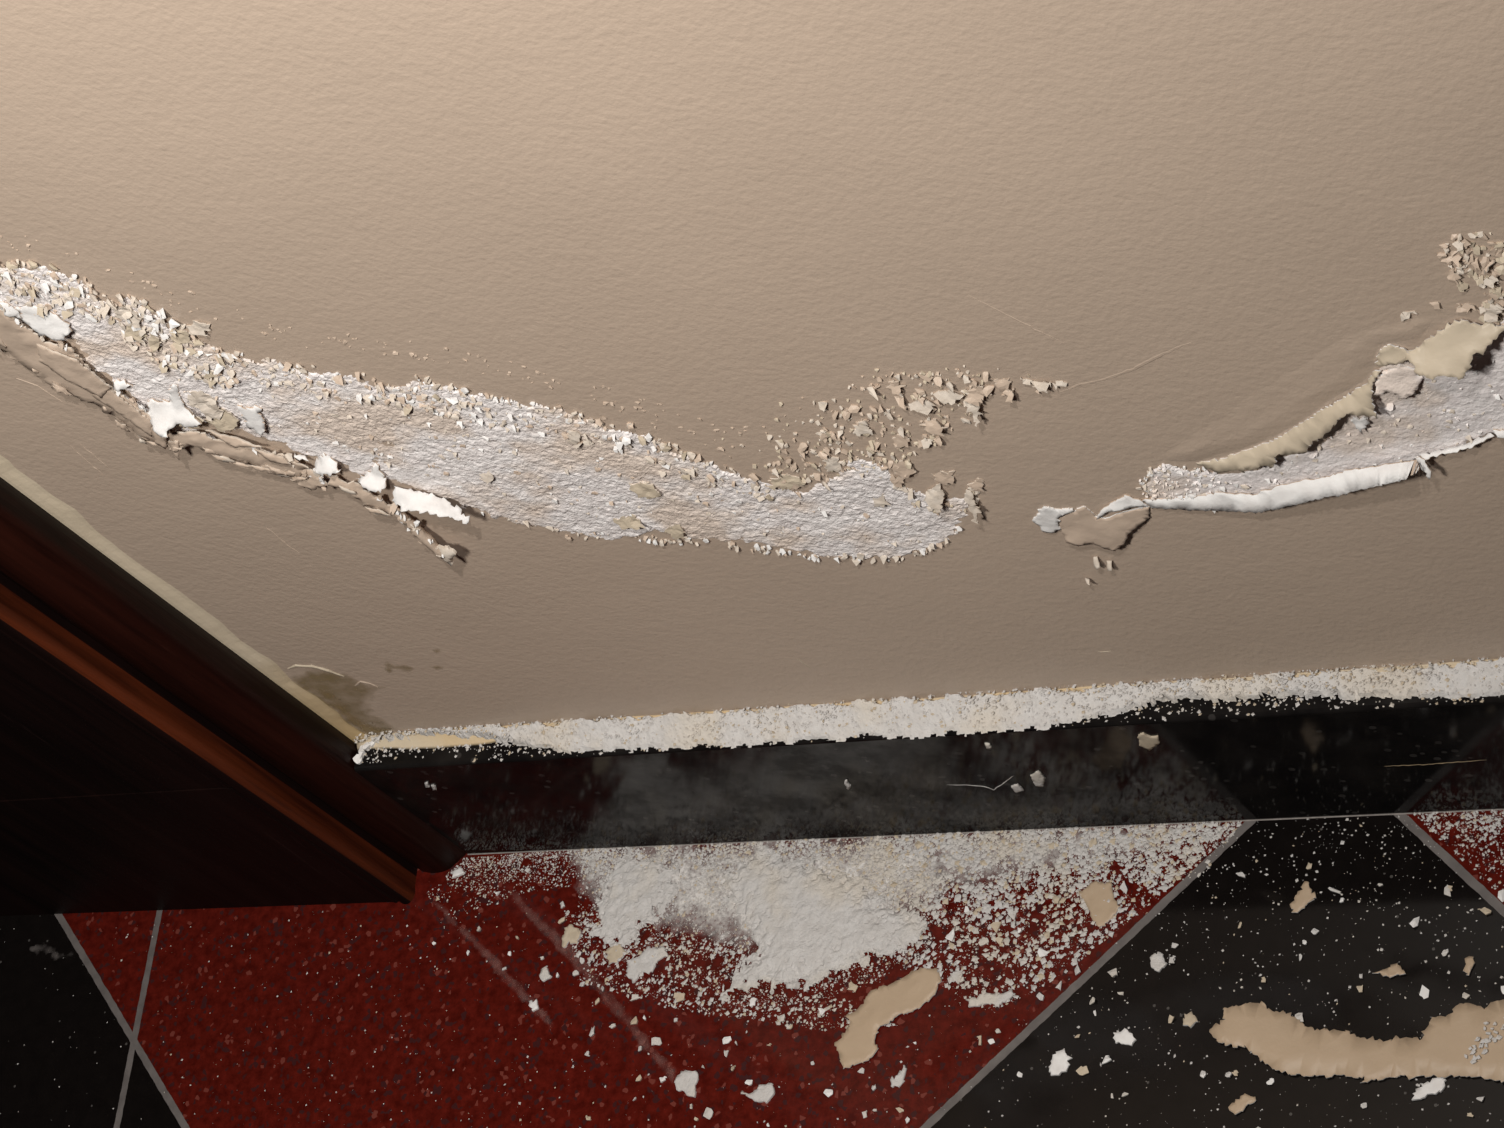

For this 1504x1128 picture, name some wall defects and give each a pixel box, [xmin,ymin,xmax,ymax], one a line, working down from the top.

flaking render [0,236,968,566]
peeling [1032,312,1504,585]
peeling [1137,732,1160,751]